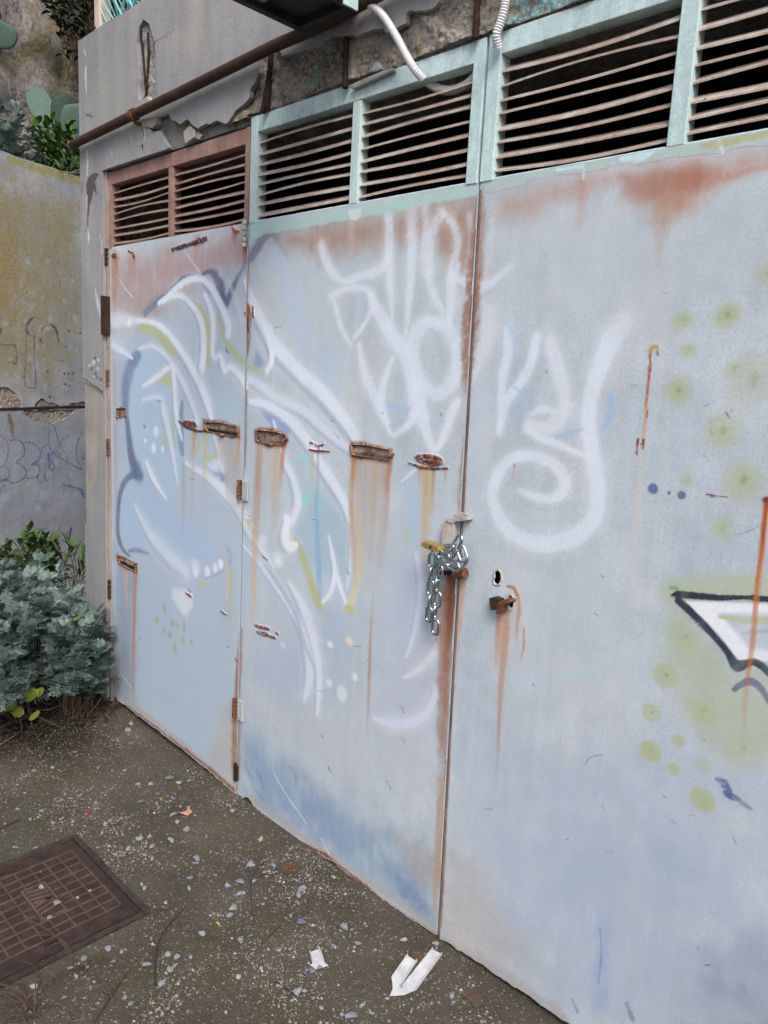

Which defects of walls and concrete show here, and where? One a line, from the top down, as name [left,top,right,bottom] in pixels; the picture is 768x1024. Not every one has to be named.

spalling [139,0,586,151]
corrosion [454,145,768,397]
flaking render [0,356,103,521]
corrosion [111,346,291,818]
corrosion [301,433,470,934]
corrosion [490,583,526,793]
corrosion [625,342,661,593]
corrosion [739,494,768,743]